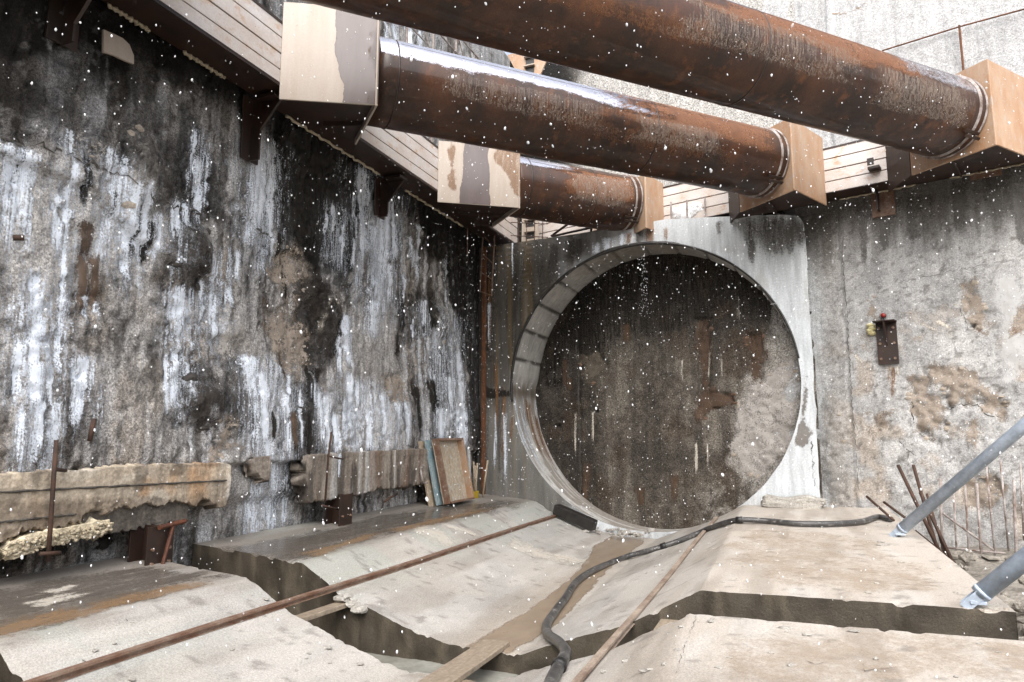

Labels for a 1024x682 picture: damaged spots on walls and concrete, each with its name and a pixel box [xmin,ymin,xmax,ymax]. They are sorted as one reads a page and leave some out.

water stain [0,122,519,563]
spalling [266,242,310,302]
water stain [511,230,785,386]
water stain [738,215,806,263]
crack [841,220,859,489]
water stain [859,215,891,263]
water stain [984,169,1024,244]
water stain [486,387,543,475]
spalling [905,362,1010,446]